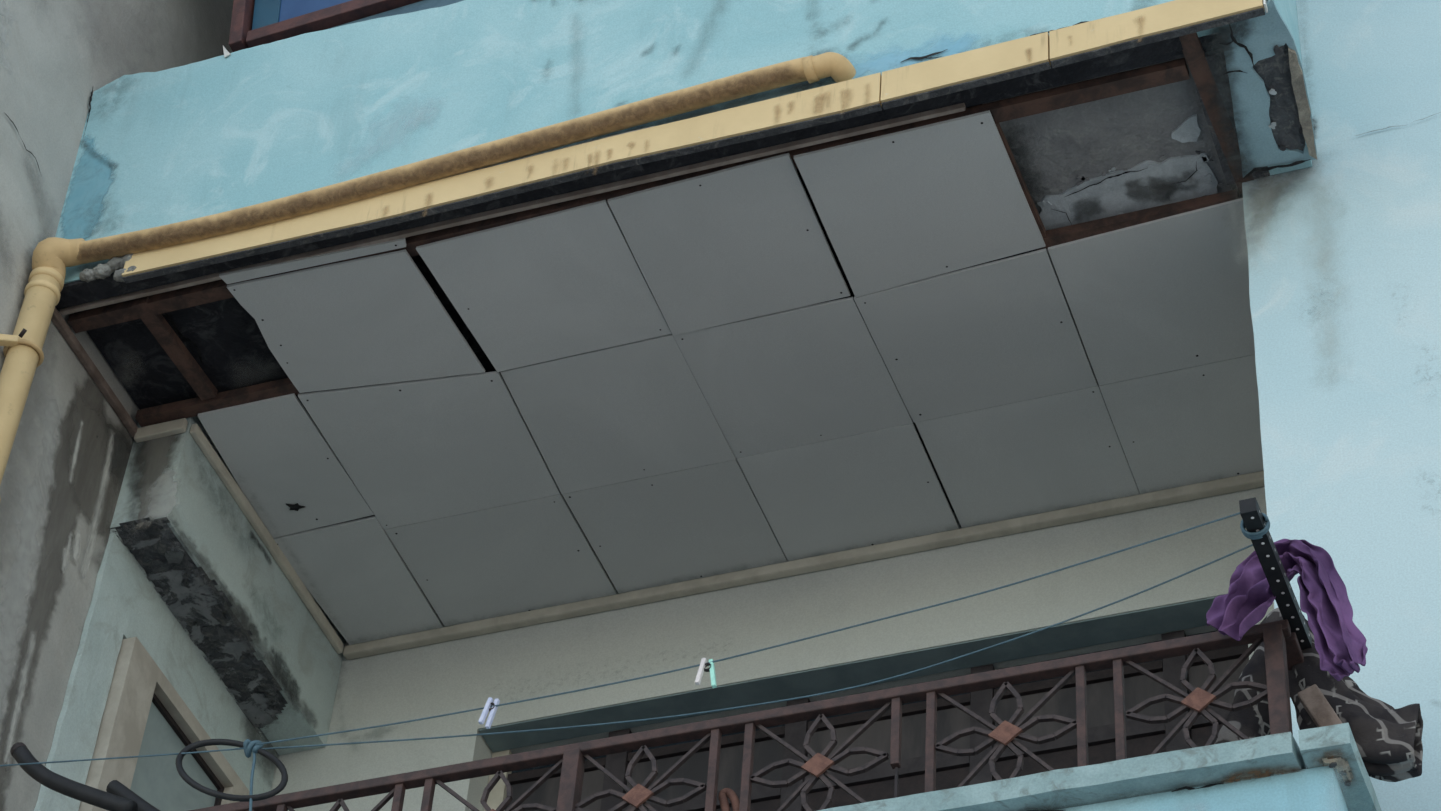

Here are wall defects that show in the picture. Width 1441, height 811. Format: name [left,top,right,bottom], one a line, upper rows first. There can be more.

leakage [55,37,1193,310]
peeling [1037,114,1223,230]
spalling [1253,43,1317,159]
leakage [0,379,132,811]
spalling [110,434,316,732]